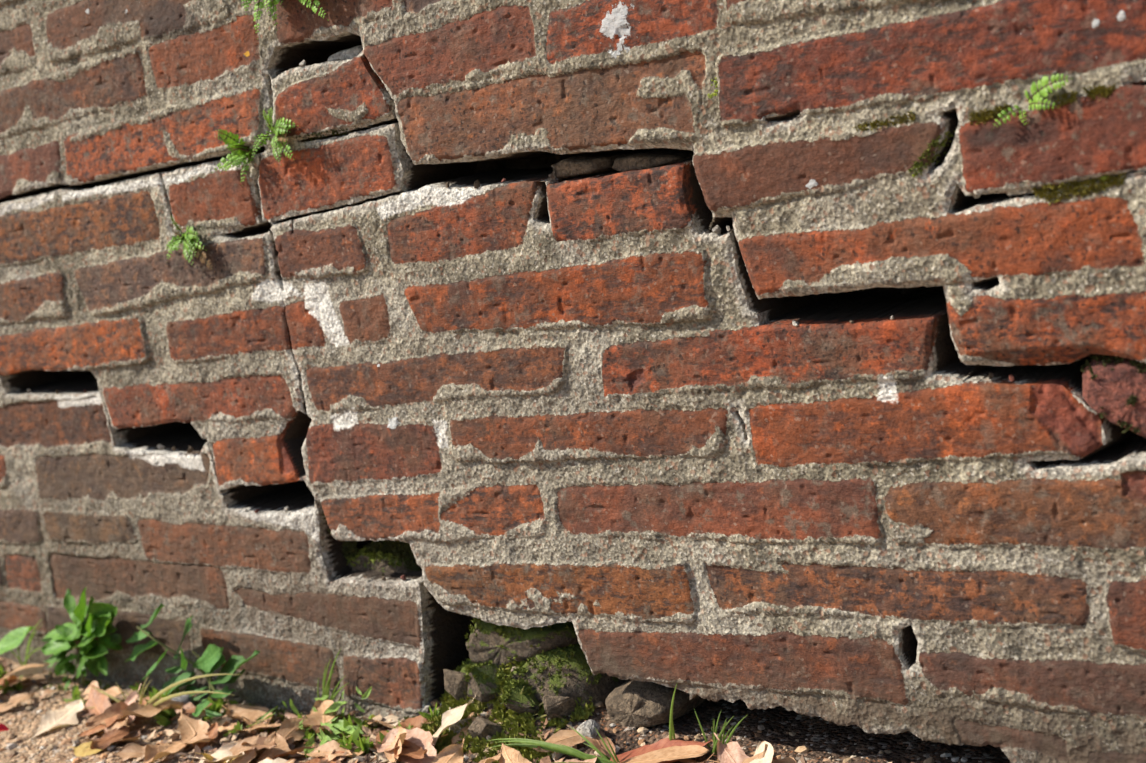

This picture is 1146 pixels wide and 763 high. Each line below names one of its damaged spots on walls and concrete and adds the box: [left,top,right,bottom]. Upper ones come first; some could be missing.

crack [0,152,237,232]
crack [217,30,1146,471]
water stain [987,0,1146,53]
crack [0,302,494,714]